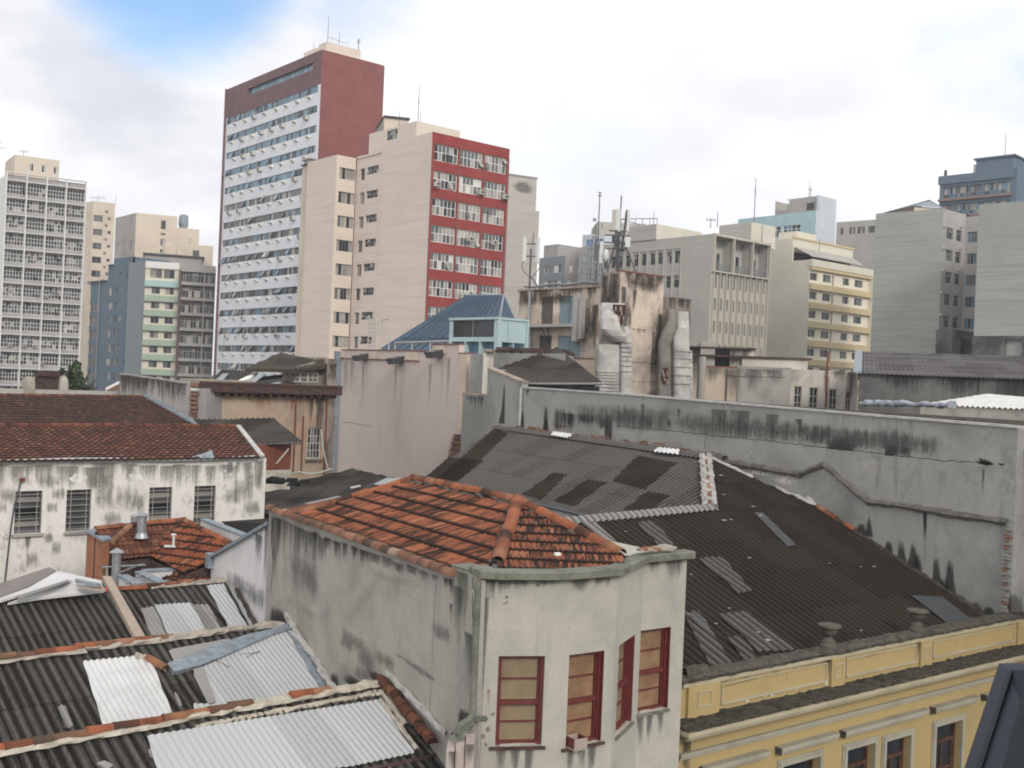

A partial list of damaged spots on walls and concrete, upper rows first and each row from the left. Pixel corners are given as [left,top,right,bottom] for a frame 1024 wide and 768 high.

leakage [520,272,663,342]
leakage [651,314,662,373]
leakage [543,405,934,456]
leakage [0,461,263,511]
leakage [857,519,873,537]
leakage [256,517,467,614]
leakage [234,577,286,623]
leakage [331,636,390,686]